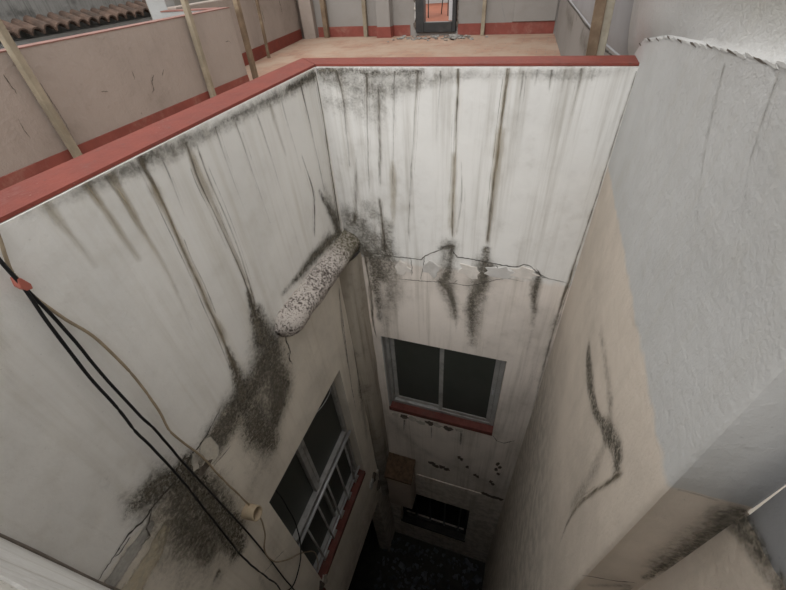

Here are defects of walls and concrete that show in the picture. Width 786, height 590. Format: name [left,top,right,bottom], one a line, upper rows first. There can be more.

damp [140,155,185,257]
damp [289,124,398,319]
damp [438,229,456,316]
crack [370,246,568,286]
damp [468,147,499,327]
damp [196,252,290,451]
damp [129,453,246,562]
damp [642,509,770,579]